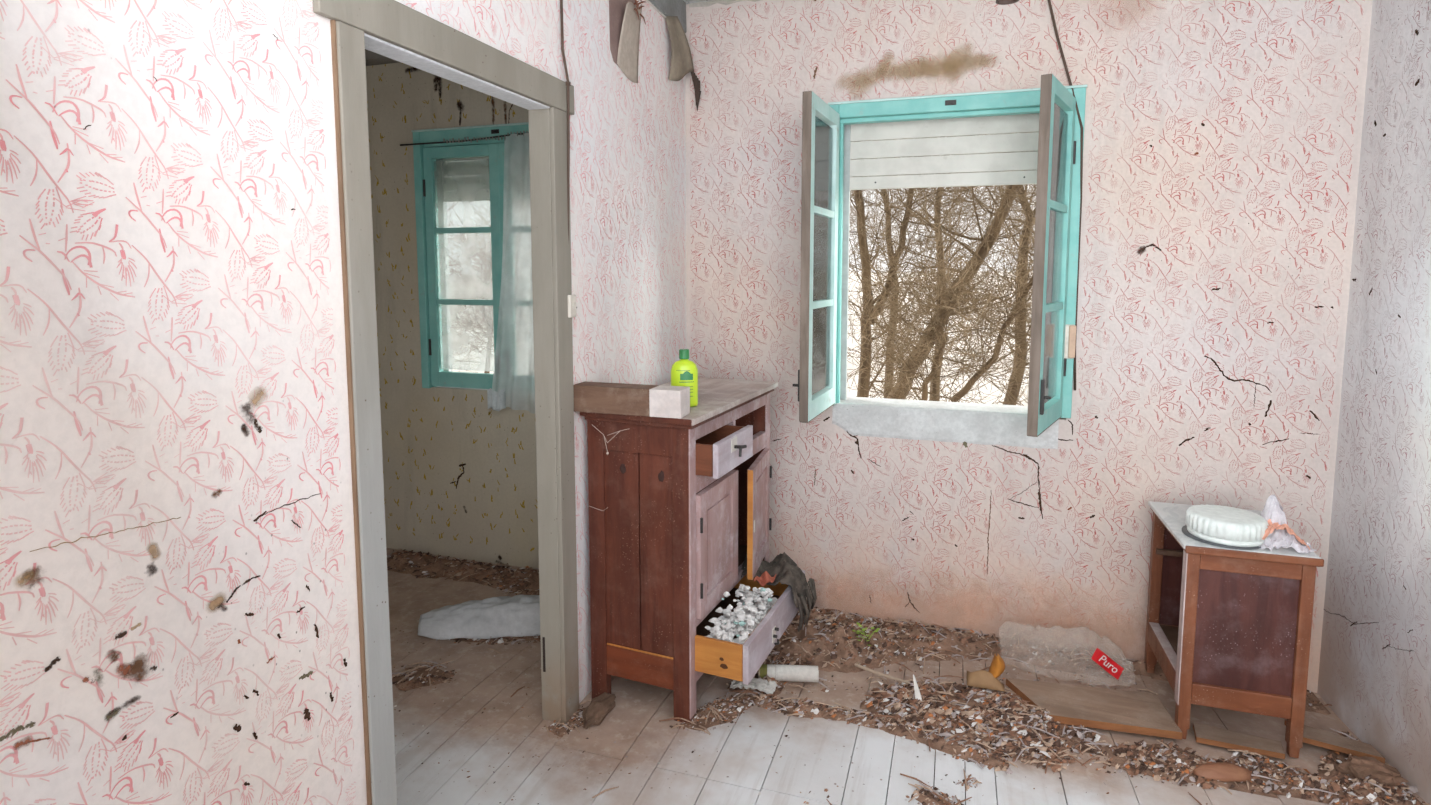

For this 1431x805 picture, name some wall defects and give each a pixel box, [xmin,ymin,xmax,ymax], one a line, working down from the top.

crack [1204,356,1272,403]
crack [963,420,1073,574]